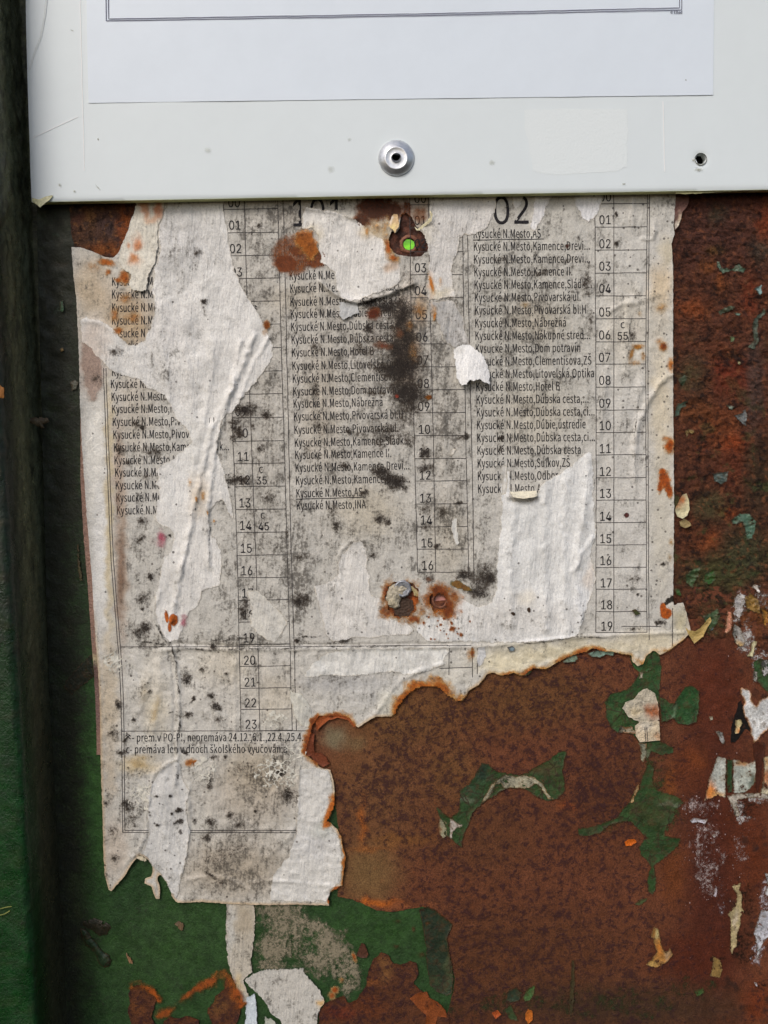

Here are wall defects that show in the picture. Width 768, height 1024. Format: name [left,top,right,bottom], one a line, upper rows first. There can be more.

spalling [69,203,137,258]
corrosion [273,229,325,273]
corrosion [354,199,424,262]
peeling [302,197,496,348]
damp [345,274,438,472]
peeling [80,201,273,642]
corrosion [657,192,768,654]
corrosion [380,580,471,640]
damp [191,693,223,723]
spalling [270,452,768,1024]
damp [277,769,300,802]
damp [156,808,238,885]